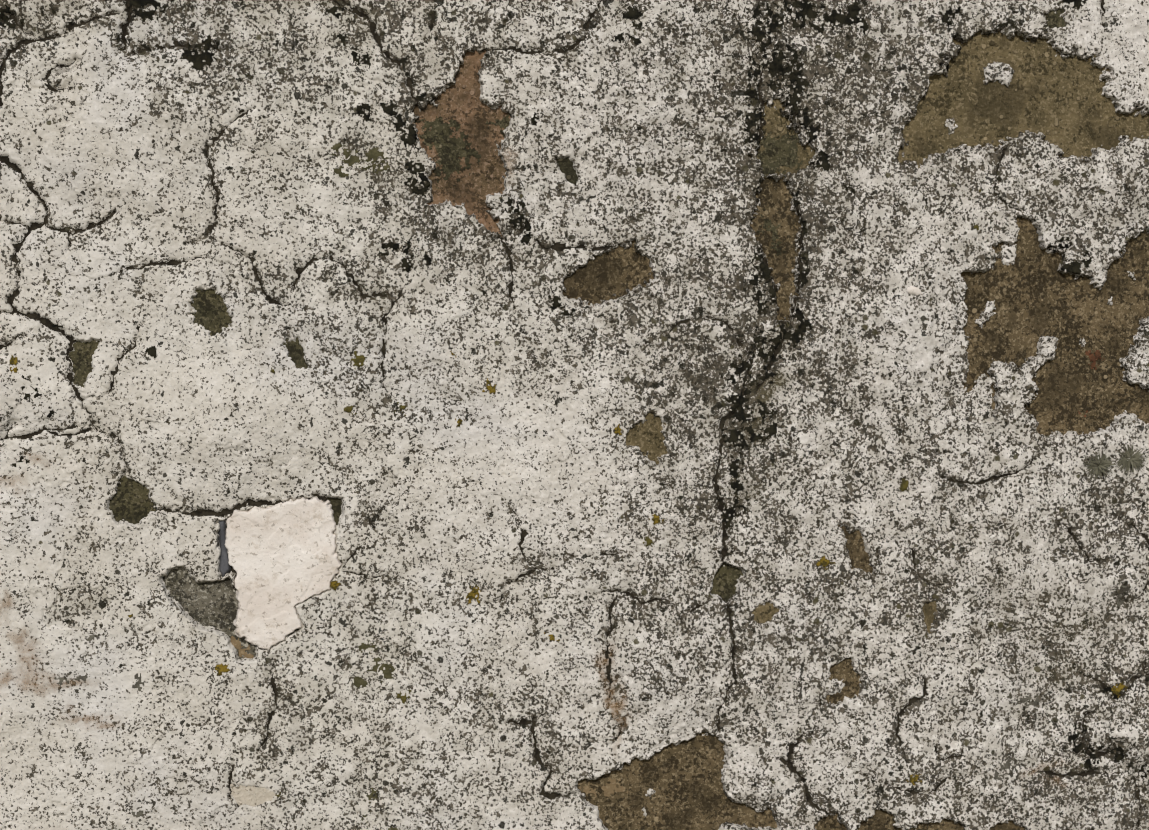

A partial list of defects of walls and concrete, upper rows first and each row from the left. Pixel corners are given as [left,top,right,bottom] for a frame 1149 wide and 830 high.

crack [0,0,222,106]
spalling [411,46,518,248]
spalling [896,9,1149,168]
crack [0,156,143,474]
crack [119,108,402,396]
spalling [561,238,658,308]
spalling [957,215,1149,440]
crack [155,494,327,528]
spalling [160,564,259,663]
crack [596,589,737,733]
crack [506,705,575,799]
spalling [574,730,782,830]